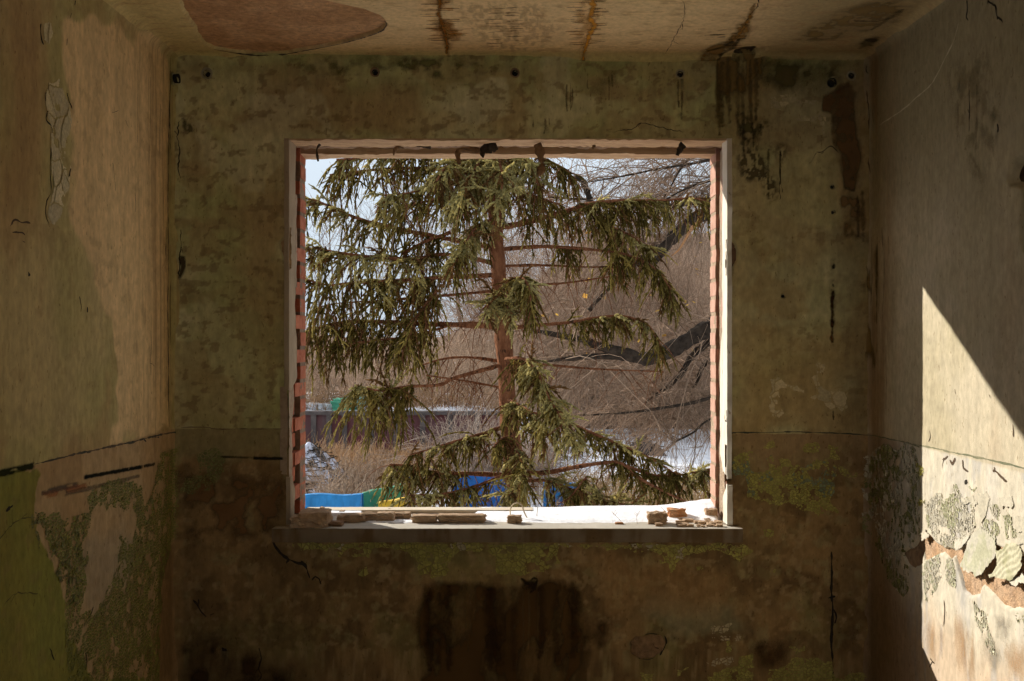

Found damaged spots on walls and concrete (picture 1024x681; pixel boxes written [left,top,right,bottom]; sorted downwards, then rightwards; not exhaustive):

peeling [46,79,72,225]
flaking render [182,0,387,56]
damp [700,3,812,199]
damp [822,69,865,238]
peeling [31,448,180,681]
crack [272,542,321,584]
peeling [861,443,1024,656]